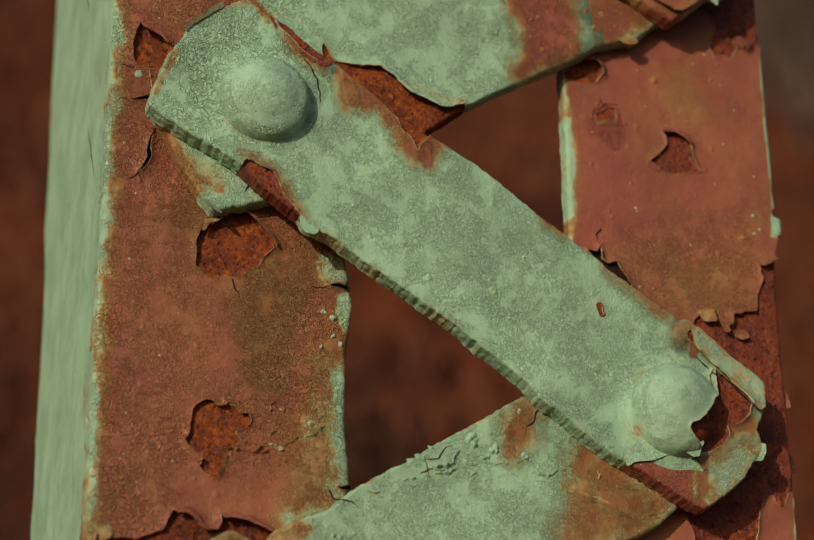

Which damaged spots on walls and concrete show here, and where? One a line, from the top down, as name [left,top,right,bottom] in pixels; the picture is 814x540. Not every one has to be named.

corrosion [501,0,653,85]
corrosion [658,0,757,58]
crack [302,56,321,105]
corrosion [235,150,310,224]
corrosion [646,128,699,174]
corrosion [165,193,279,278]
corrosion [547,256,797,540]
peeling [686,324,766,457]
corrosion [180,400,251,477]
peeling [403,450,525,481]
peeling [626,450,668,466]
peeling [755,443,766,461]